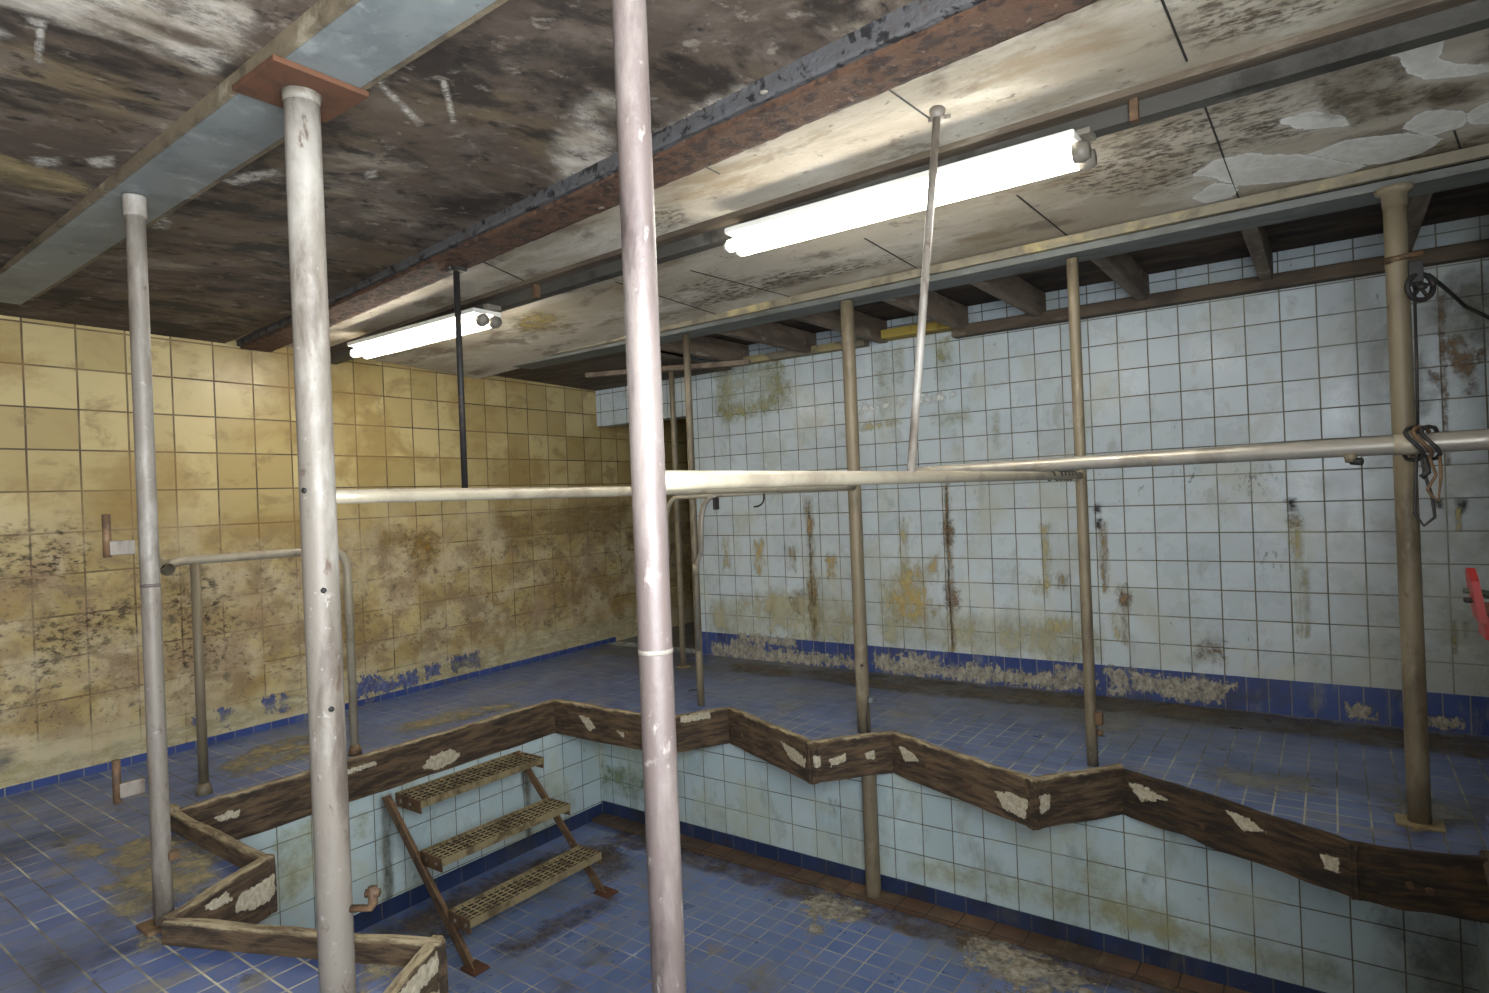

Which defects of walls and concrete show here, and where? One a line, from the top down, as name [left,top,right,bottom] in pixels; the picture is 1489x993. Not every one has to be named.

mould [1196,0,1337,43]
water stain [1065,40,1489,203]
water stain [0,155,88,193]
water stain [0,541,78,580]
mould [35,603,135,674]
water stain [172,578,238,676]